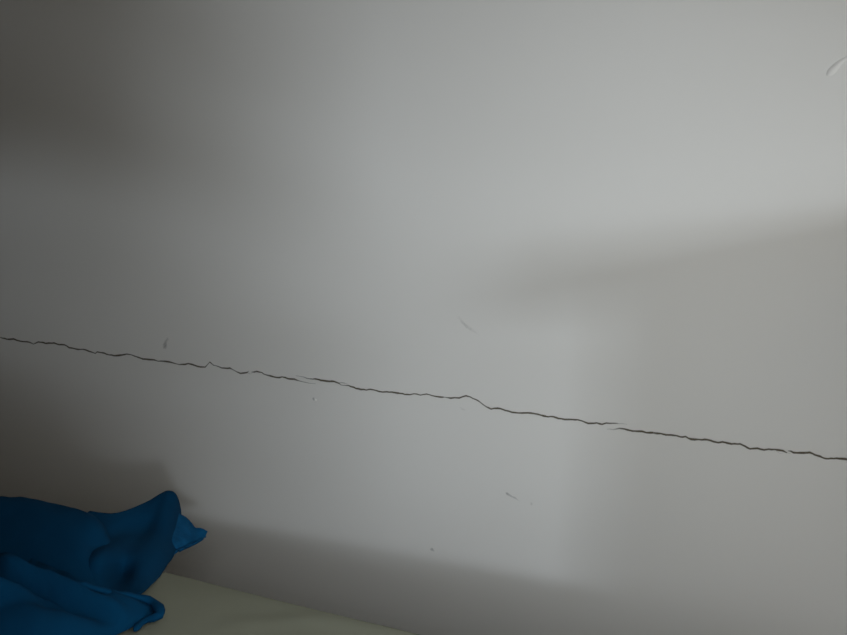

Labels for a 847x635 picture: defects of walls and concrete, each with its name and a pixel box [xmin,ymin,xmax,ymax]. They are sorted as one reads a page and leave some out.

crack [0,337,847,460]